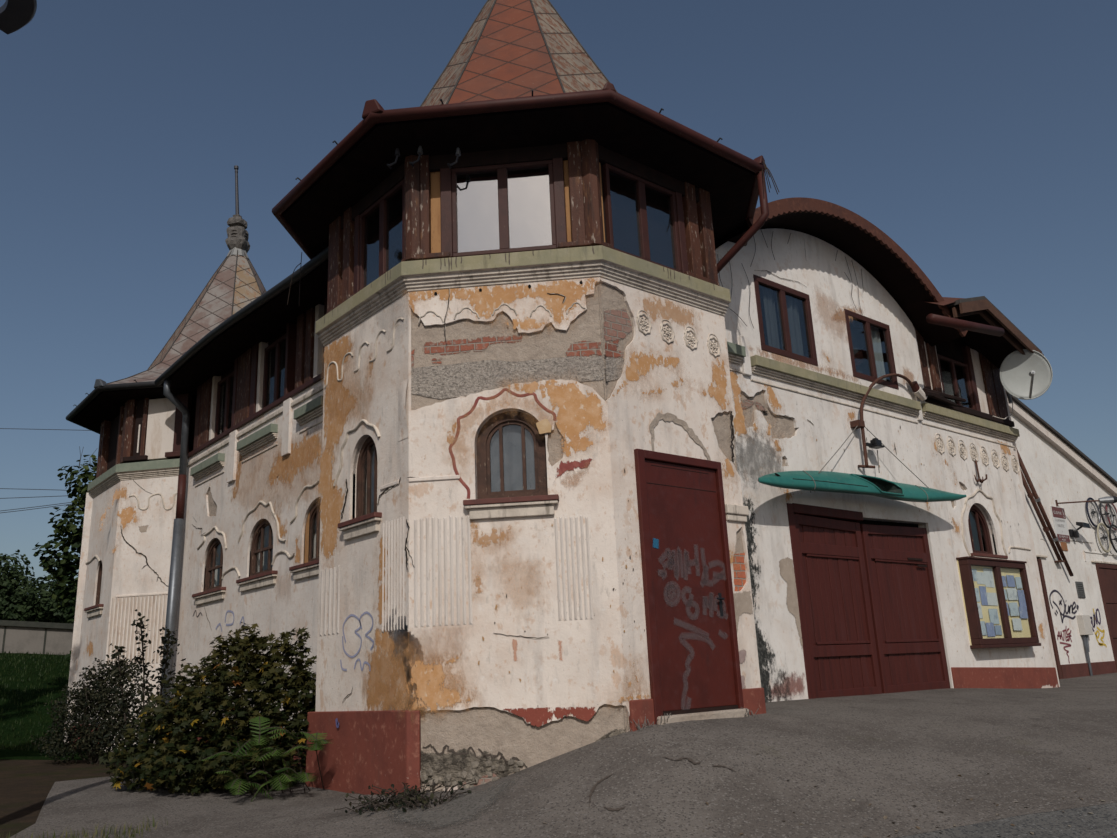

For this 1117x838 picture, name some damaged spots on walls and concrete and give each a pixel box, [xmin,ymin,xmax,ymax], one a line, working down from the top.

peeling [268,335,357,563]
spalling [408,277,694,477]
spalling [702,358,796,477]
crack [120,526,167,586]
spalling [366,535,650,793]
water stain [743,498,789,702]
peeling [779,557,803,646]